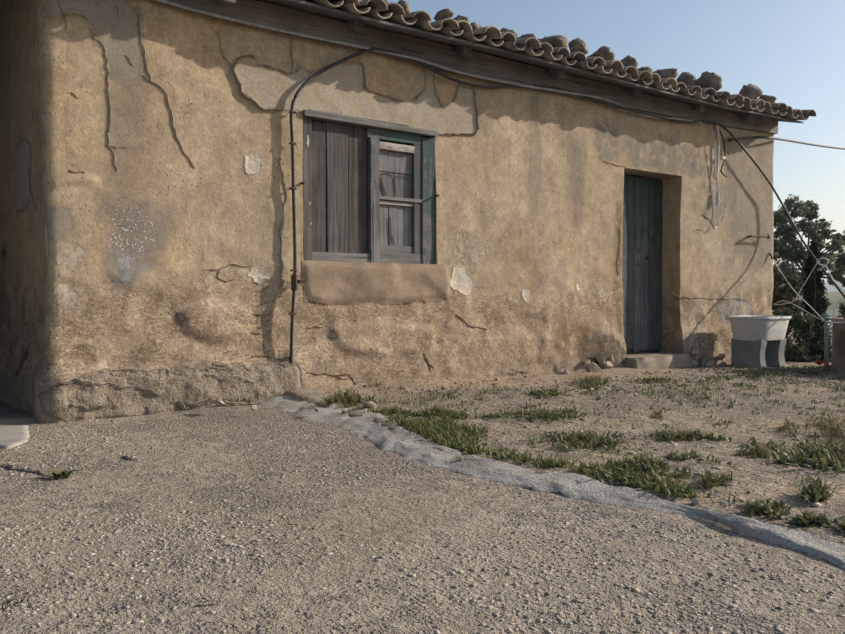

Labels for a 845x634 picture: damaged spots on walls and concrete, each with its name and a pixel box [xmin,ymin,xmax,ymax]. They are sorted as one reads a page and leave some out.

crack [89,0,195,171]
spalling [233,55,479,139]
peeling [244,153,264,175]
water stain [106,206,168,282]
crack [204,264,252,282]
peeling [247,266,270,284]
peeling [450,265,475,295]
crack [101,366,175,374]
crack [213,355,273,366]